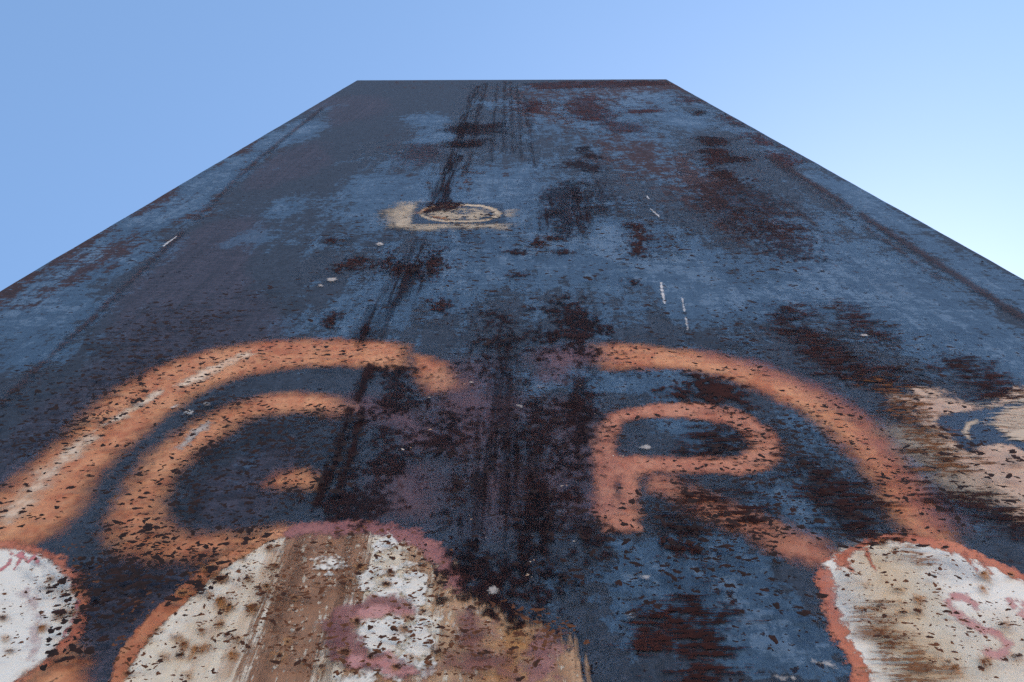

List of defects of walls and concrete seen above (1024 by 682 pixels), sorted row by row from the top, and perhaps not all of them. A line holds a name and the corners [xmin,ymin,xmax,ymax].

corrosion [325,246,463,282]
corrosion [417,198,470,219]
corrosion [676,95,1023,318]
peeling [0,191,1024,682]
corrosion [745,298,1024,540]
corrosion [611,581,767,682]